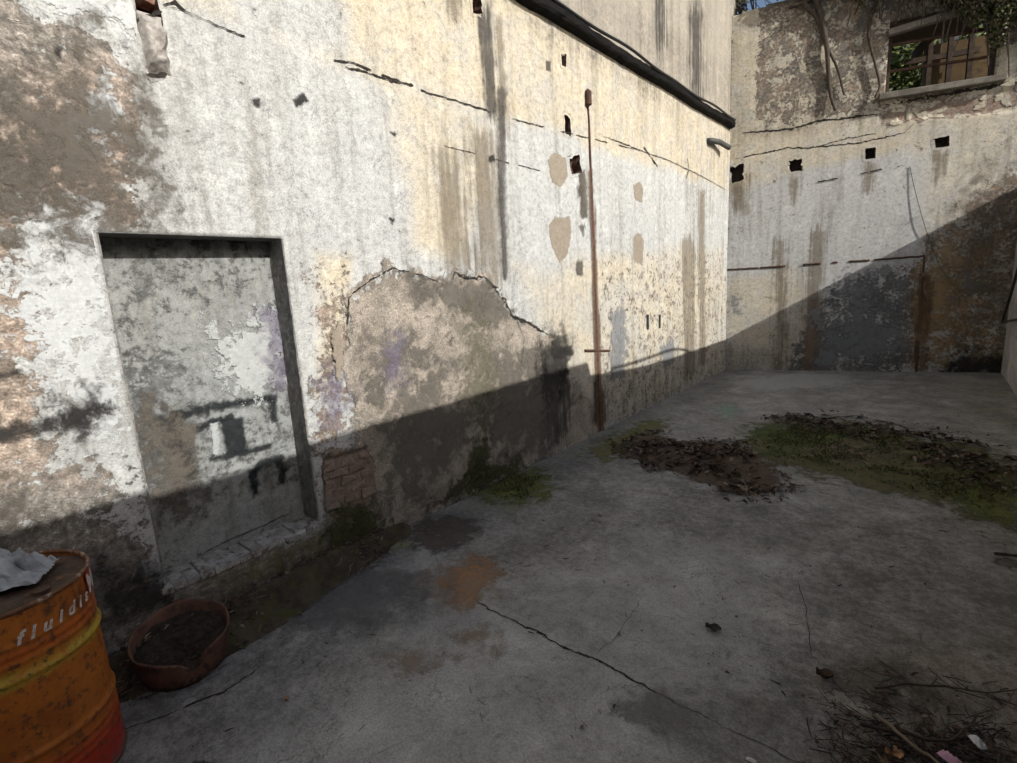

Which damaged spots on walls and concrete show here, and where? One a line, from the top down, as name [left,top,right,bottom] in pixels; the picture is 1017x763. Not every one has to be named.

peeling [24,0,168,82]
crack [163,0,245,37]
crack [334,59,489,112]
damp [440,8,508,281]
crack [513,118,727,191]
damp [655,0,668,54]
damp [689,7,704,98]
crack [737,114,914,159]
spalling [878,81,1017,128]
peeling [0,184,131,470]
corrosion [576,169,608,432]
spalling [321,257,599,534]